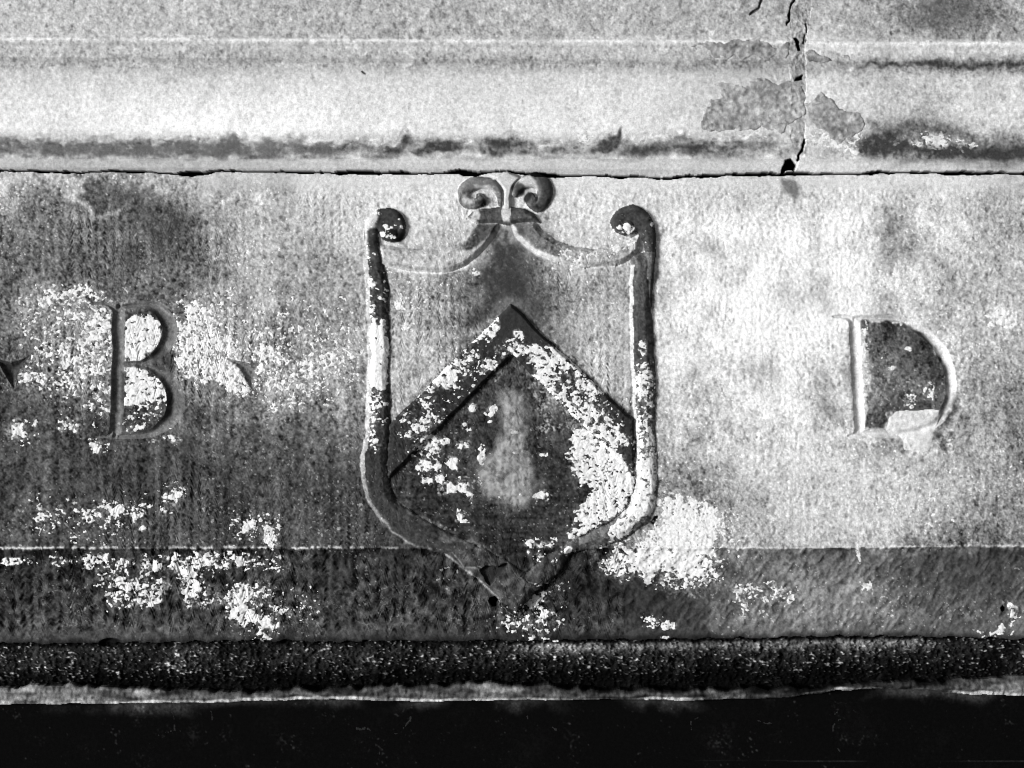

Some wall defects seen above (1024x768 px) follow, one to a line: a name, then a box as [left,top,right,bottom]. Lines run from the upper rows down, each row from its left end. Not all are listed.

crack [786,0,808,45]
peeling [701,78,866,157]
leakage [479,230,524,321]
leakage [478,392,532,506]